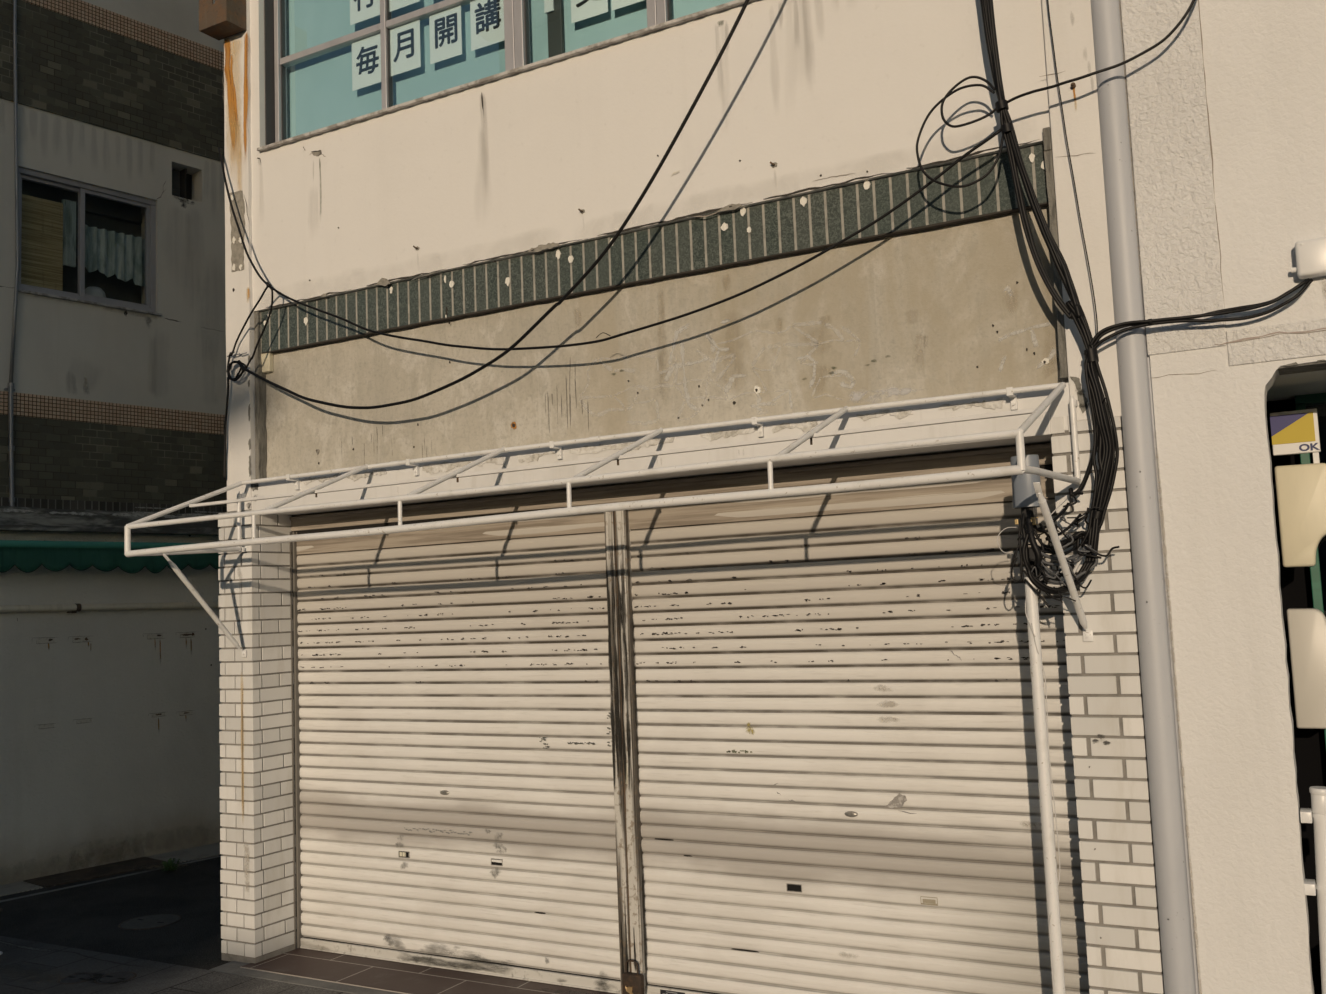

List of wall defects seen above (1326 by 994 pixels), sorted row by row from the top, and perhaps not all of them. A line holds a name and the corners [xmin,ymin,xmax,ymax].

corrosion [224,33,248,154]